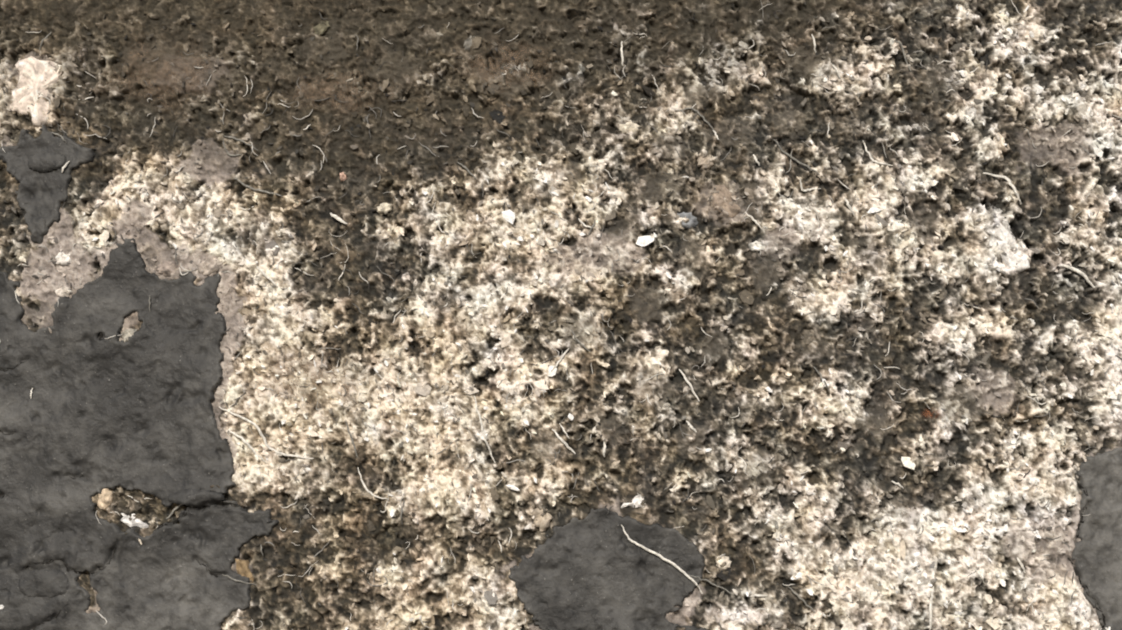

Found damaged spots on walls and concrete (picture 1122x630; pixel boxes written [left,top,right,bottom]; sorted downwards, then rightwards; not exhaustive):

spalling [95,227,112,250]
spalling [97,295,151,342]
spalling [215,284,223,314]
spalling [92,486,189,545]
spalling [77,571,107,624]